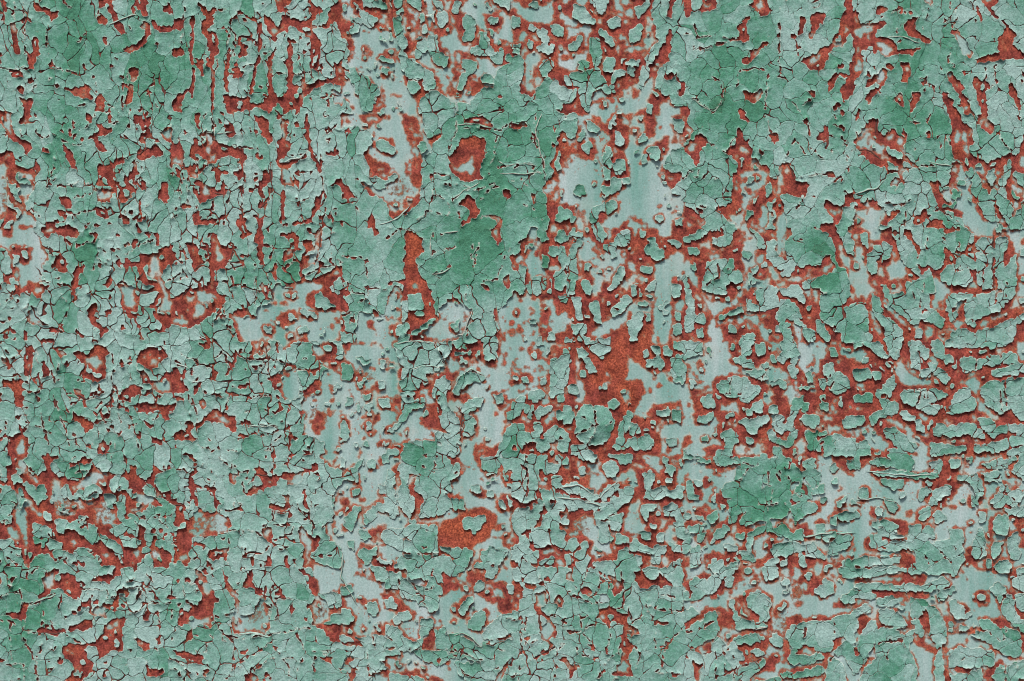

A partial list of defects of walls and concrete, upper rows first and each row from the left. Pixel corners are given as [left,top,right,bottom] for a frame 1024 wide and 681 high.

rust [0,0,87,156]
rust [417,113,528,245]
rust [791,0,937,186]
crack [2,239,154,473]
crack [88,447,334,681]
crack [173,243,282,449]
rust [0,150,483,681]
peeling [357,368,486,612]
crack [451,574,764,680]
peeling [697,332,787,424]
peeling [755,427,972,681]
peeling [852,351,1024,681]